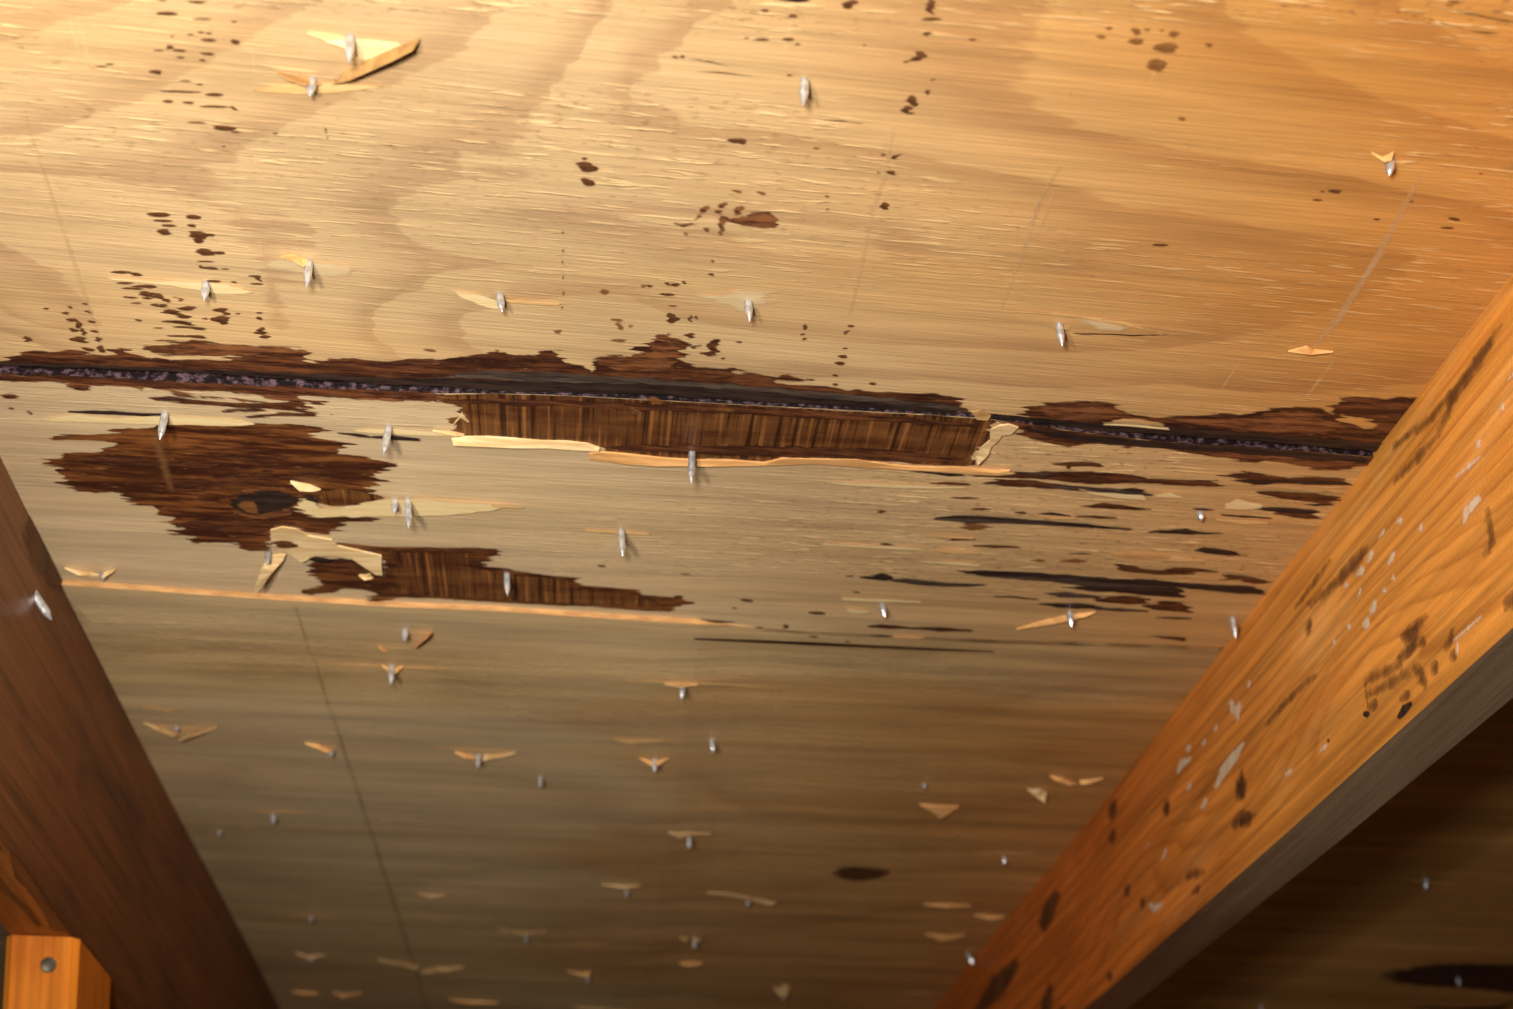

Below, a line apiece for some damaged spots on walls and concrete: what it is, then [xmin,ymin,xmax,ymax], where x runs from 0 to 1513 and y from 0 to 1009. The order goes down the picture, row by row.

damp [147,212,262,285]
damp [0,271,979,428]
damp [1430,347,1486,420]
damp [62,453,299,492]
peeling [337,410,1018,474]
damp [23,516,63,591]
damp [169,515,295,533]
peeling [270,526,382,581]
damp [602,397,1417,641]
damp [1383,620,1456,719]